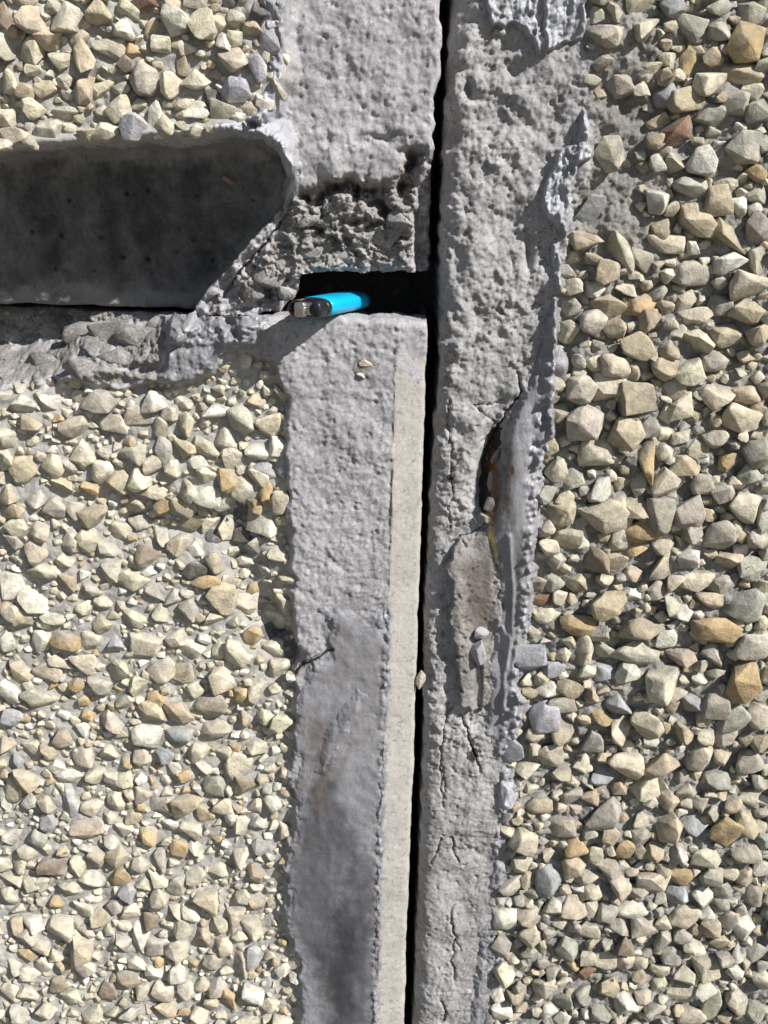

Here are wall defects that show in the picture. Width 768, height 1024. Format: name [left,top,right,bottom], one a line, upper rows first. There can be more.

spalling [230,151,426,306]
crack [447,374,523,541]
crack [439,703,480,807]
crack [450,907,461,978]